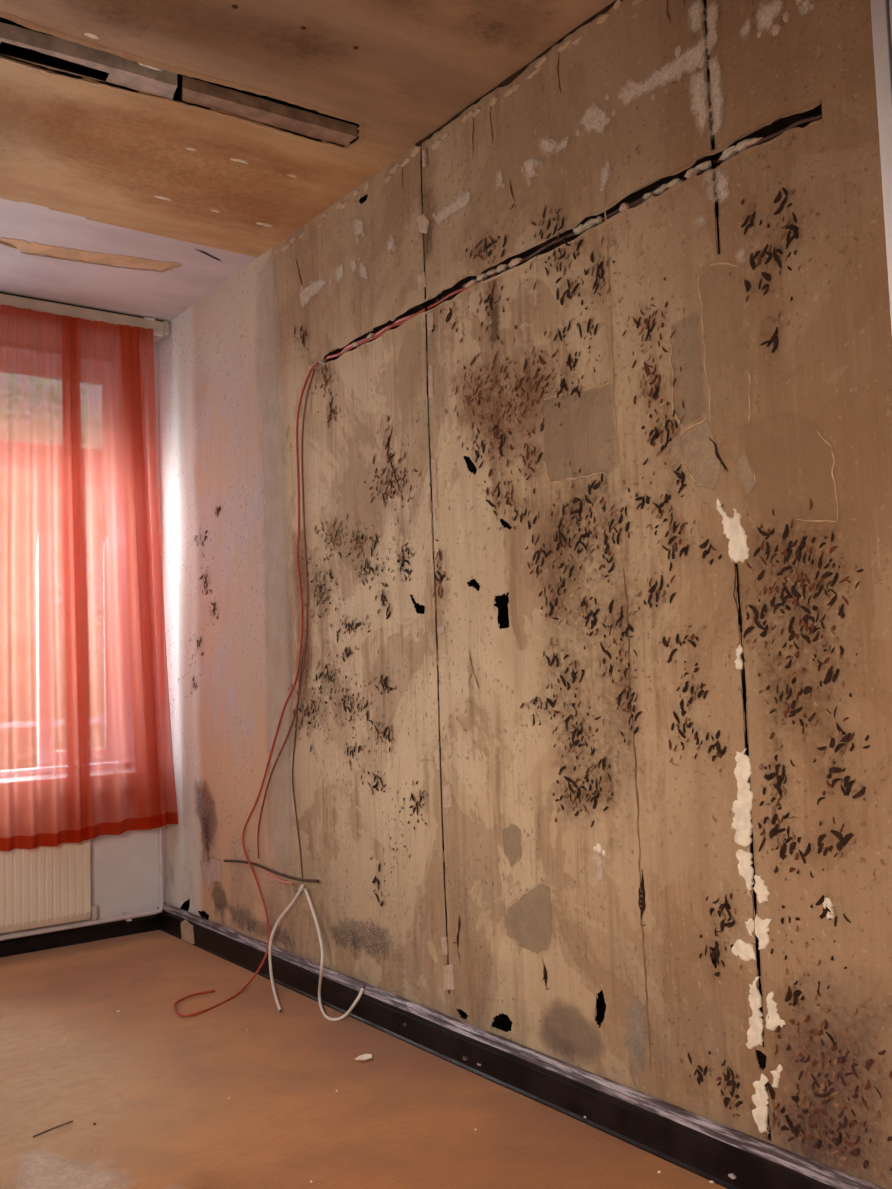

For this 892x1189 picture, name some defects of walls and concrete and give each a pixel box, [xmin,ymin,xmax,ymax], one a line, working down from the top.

flaking render [741,0,814,38]
crack [269,0,745,993]
flaking render [462,425,607,617]
spalling [464,574,512,634]
crack [708,437,787,1139]
water stain [288,857,326,913]
spalling [592,985,610,1033]